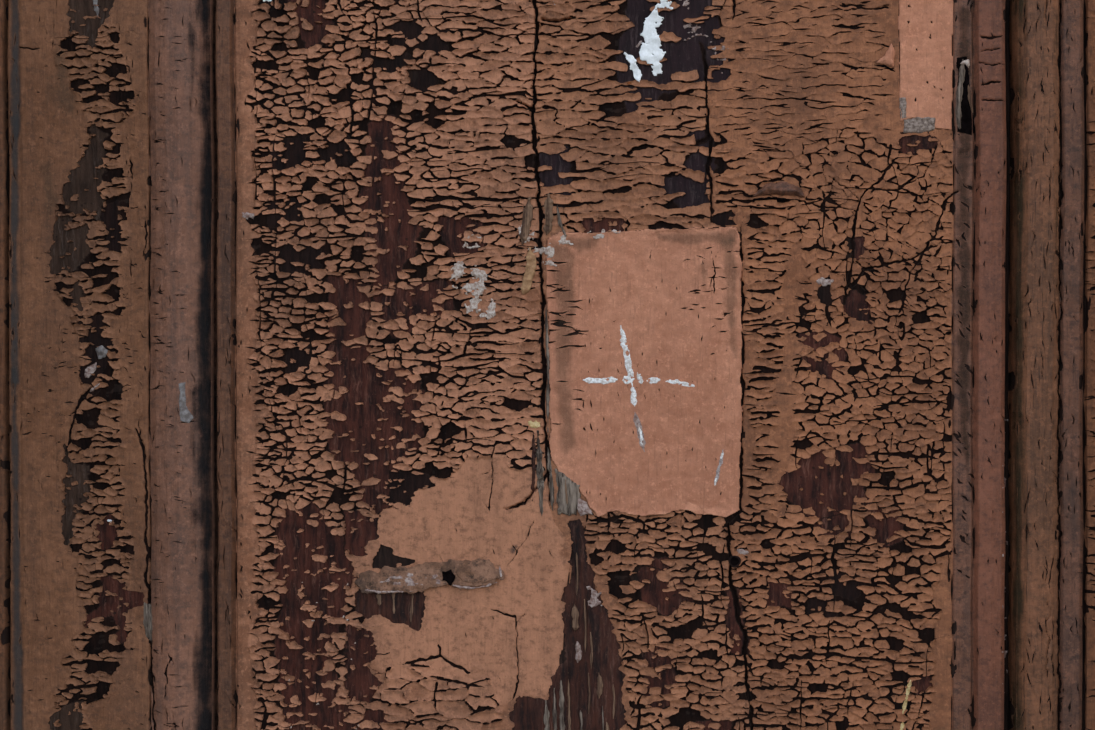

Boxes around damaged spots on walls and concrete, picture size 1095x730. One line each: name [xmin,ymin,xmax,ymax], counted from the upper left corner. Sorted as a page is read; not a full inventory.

peeling [615,0,732,115]
peeling [534,146,573,207]
peeling [659,127,716,208]
peeling [49,124,123,395]
peeling [323,115,454,514]
peeling [435,217,486,256]
crack [241,0,959,730]
peeling [797,330,847,381]
peeling [778,443,904,548]
peeling [273,501,504,730]
peeling [509,519,627,730]
peeling [637,565,693,615]